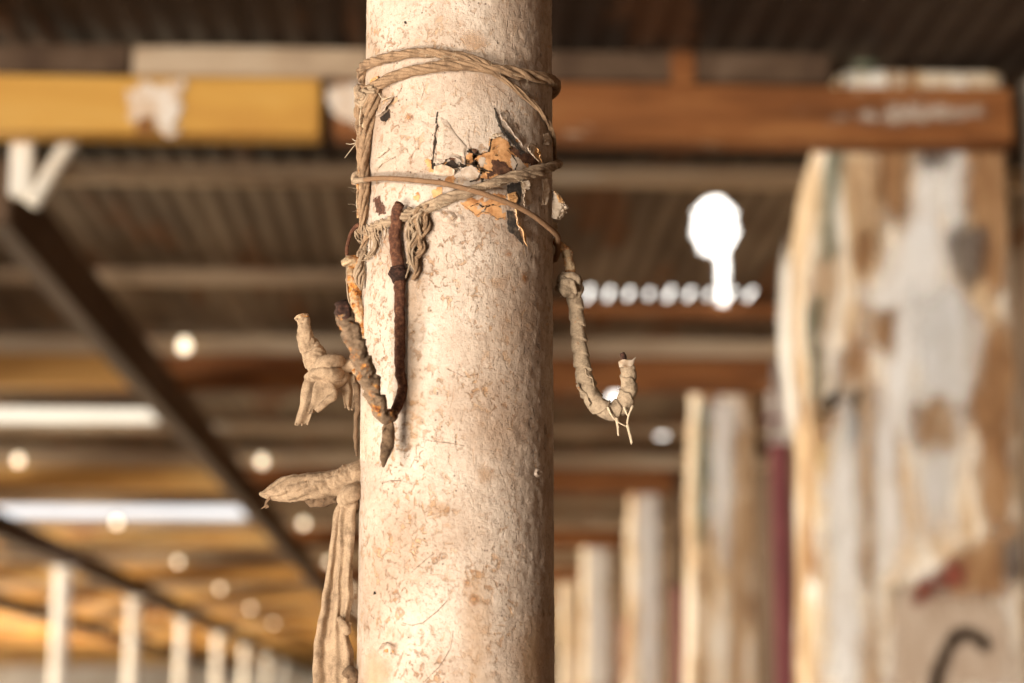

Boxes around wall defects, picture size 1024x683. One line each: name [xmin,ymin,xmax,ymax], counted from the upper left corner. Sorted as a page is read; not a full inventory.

crack [416,112,474,170]
peeling [413,107,569,248]